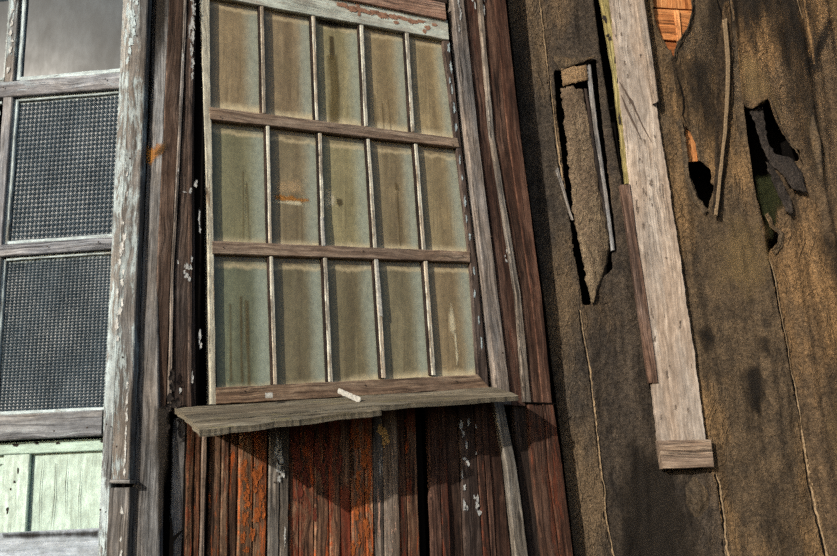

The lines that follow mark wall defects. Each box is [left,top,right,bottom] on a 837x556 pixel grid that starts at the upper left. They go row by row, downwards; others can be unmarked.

peeling [124,0,138,64]
peeling [182,0,196,81]
peeling [336,2,437,33]
peeling [240,457,266,556]
peeling [273,436,285,482]
peeling [350,424,397,556]
peeling [459,419,482,515]